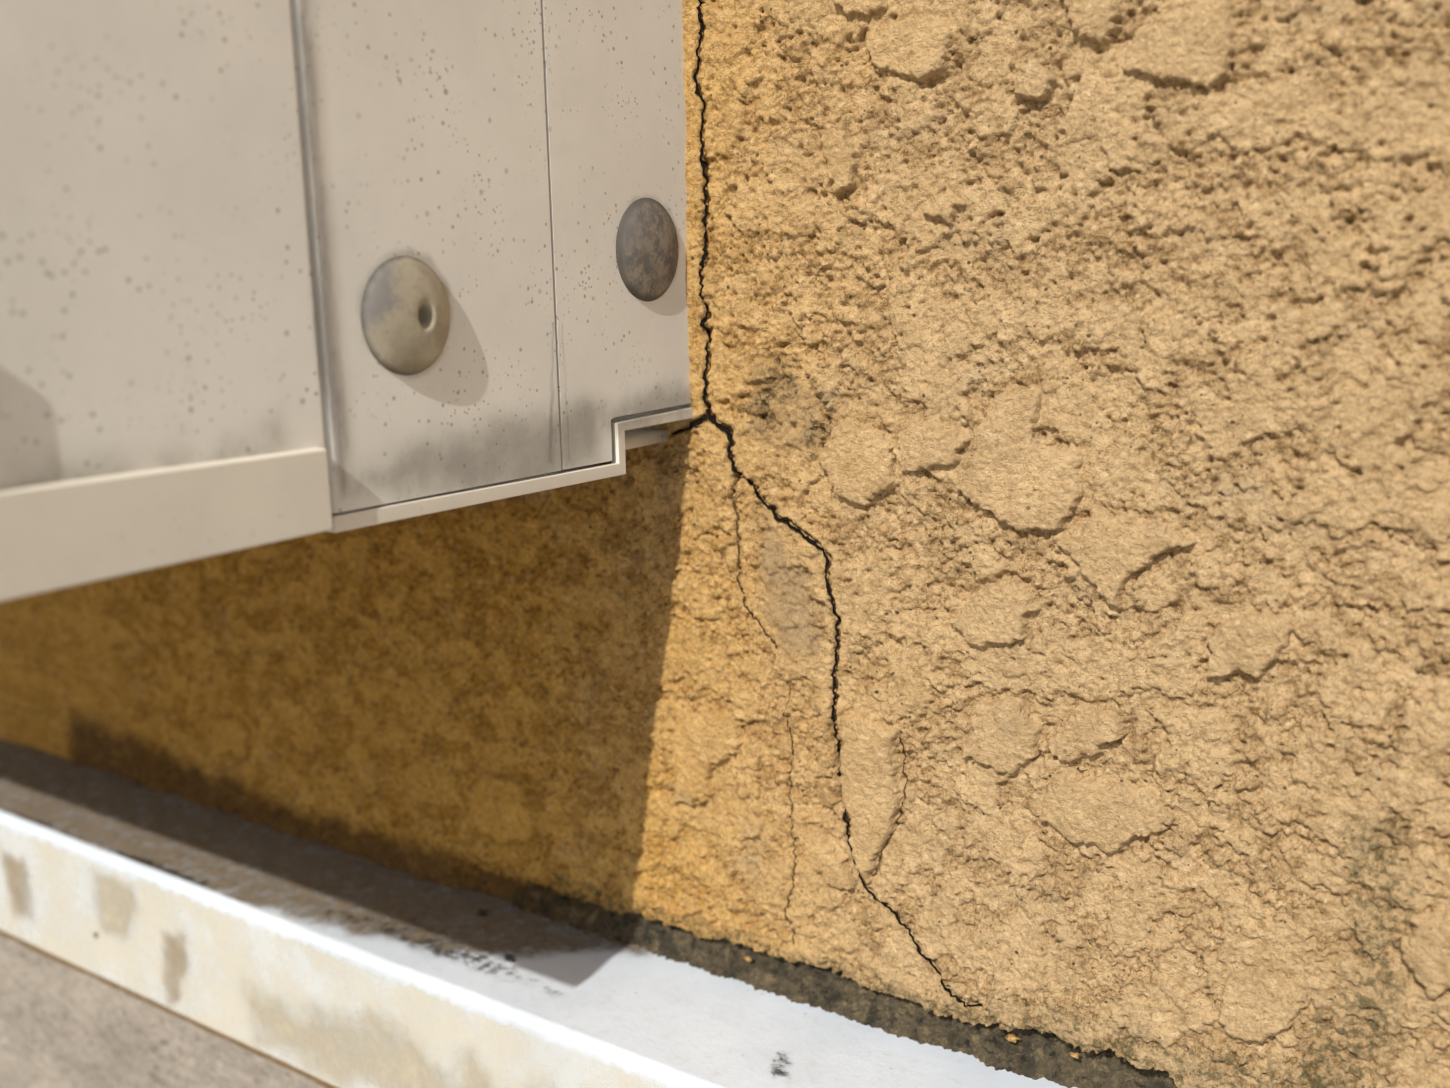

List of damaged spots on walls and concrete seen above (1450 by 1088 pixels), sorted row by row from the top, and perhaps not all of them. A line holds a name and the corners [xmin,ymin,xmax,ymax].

leakage [165,938,186,999]
crack [672,0,982,1007]